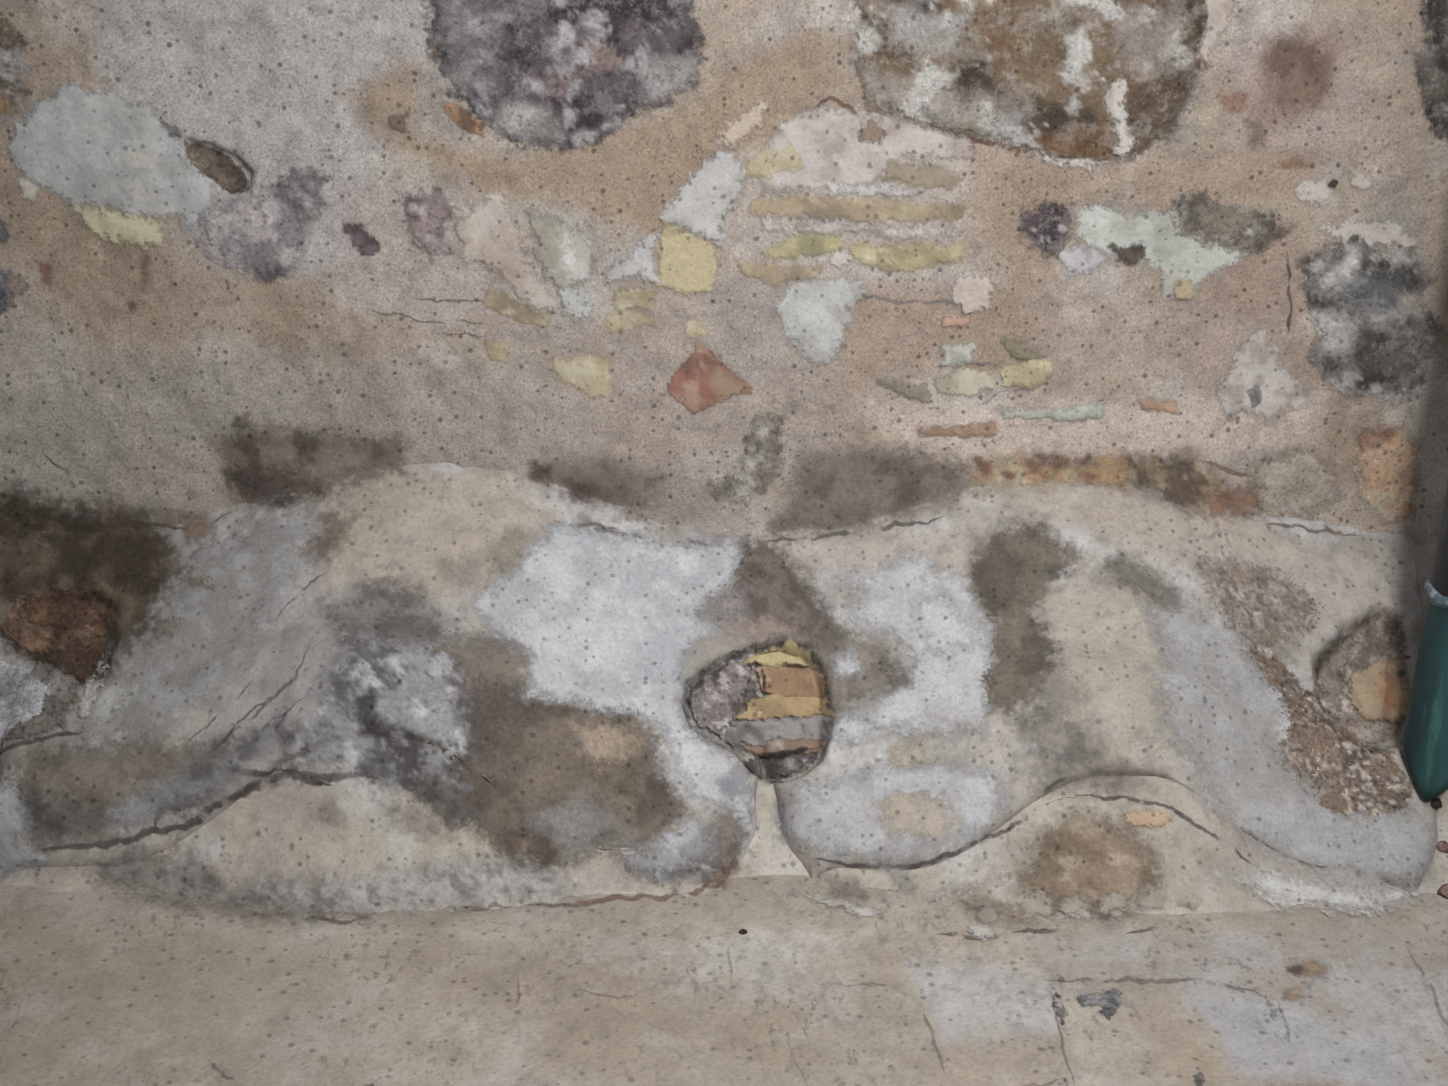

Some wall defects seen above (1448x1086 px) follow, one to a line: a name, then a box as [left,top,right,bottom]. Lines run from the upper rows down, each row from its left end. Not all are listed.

damp [531,461,654,507]
damp [0,485,214,684]
damp [304,514,356,561]
crack [0,730,86,754]
crack [36,644,416,851]
damp [7,577,753,923]
peeling [472,522,752,880]
peeling [1143,552,1448,919]
crack [799,777,1267,874]
flaking render [789,886,881,917]
flaking render [966,924,1003,941]